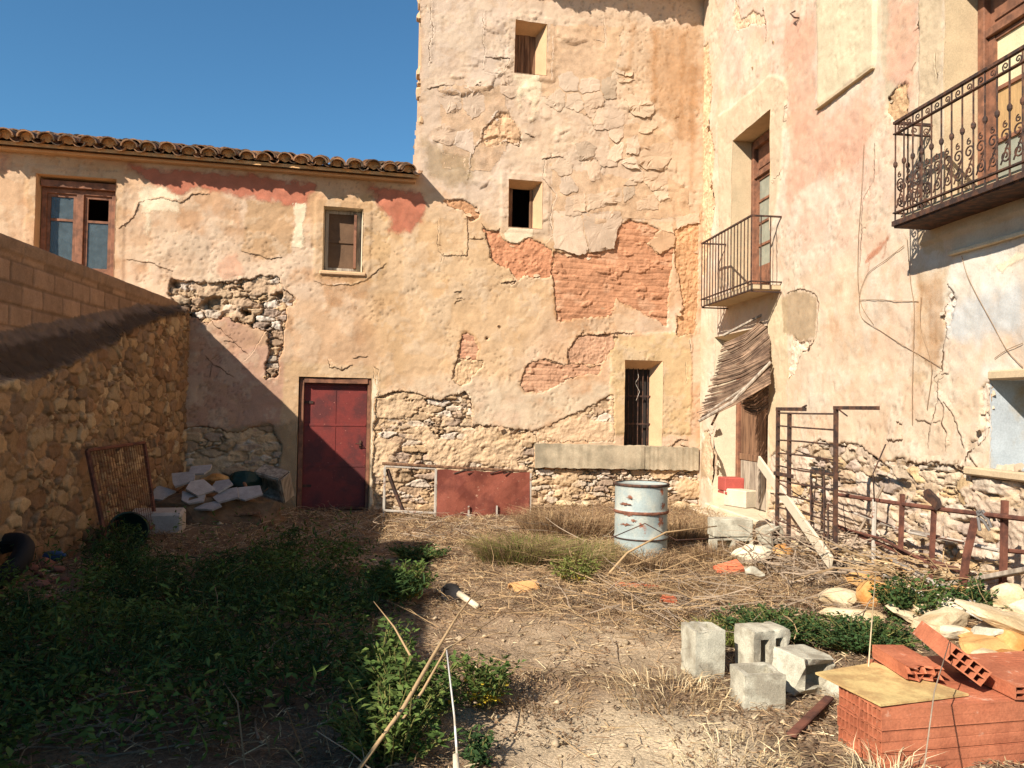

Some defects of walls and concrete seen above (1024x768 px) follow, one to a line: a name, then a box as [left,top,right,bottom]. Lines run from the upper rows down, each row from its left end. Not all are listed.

spalling [888,83,909,121]
crack [117,190,210,229]
spalling [432,23,716,337]
crack [314,262,387,286]
flaking render [169,275,295,379]
flaking render [184,424,282,480]
flaking render [372,332,718,510]
crack [886,279,1024,472]
flaking render [767,440,1024,592]